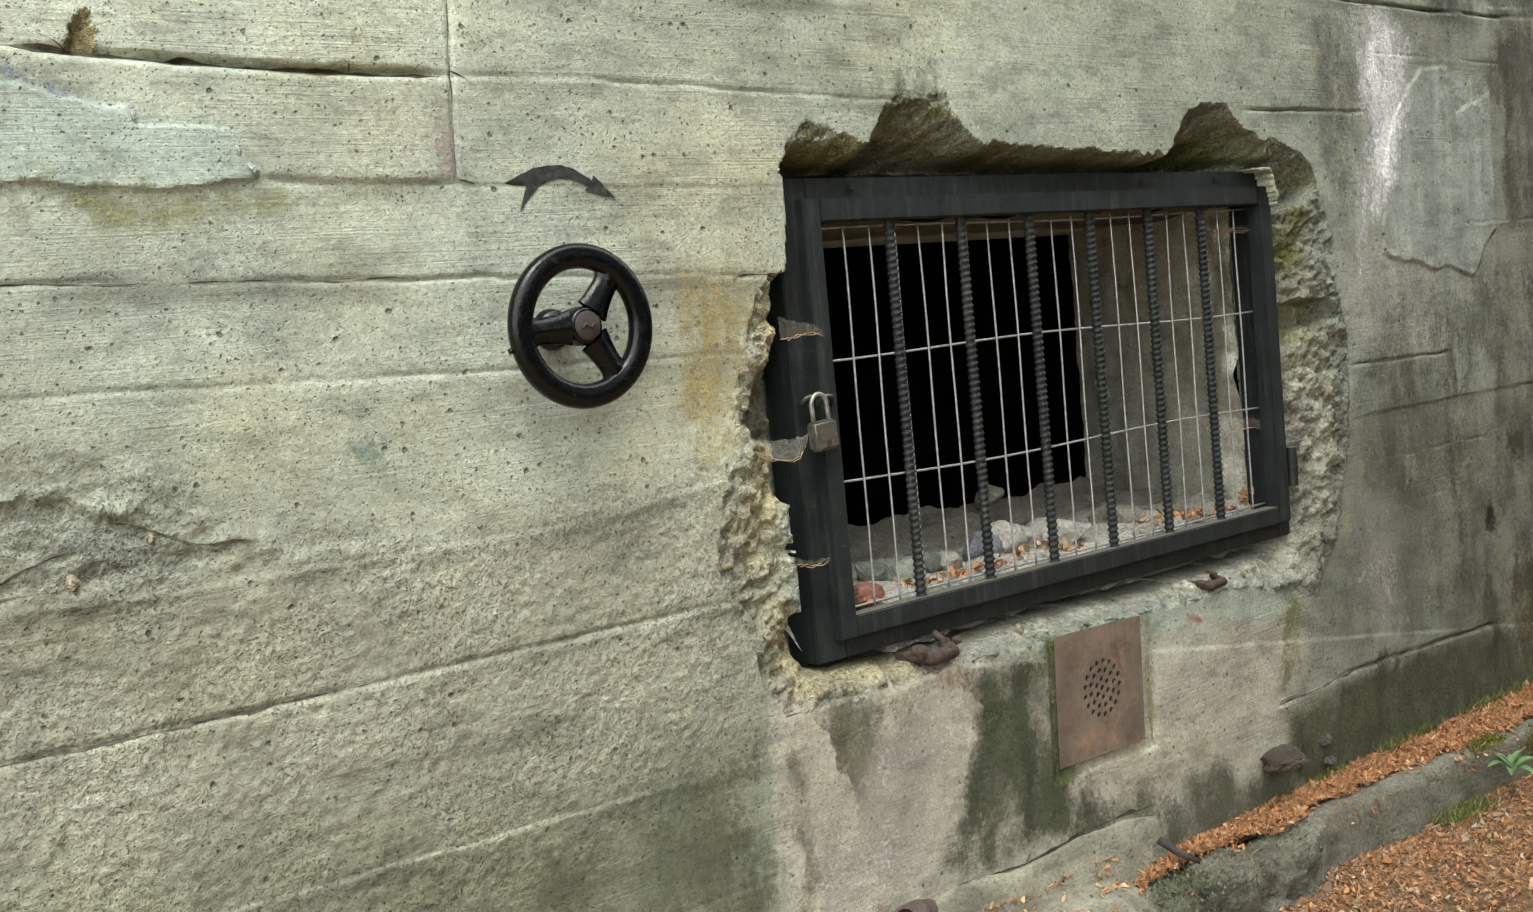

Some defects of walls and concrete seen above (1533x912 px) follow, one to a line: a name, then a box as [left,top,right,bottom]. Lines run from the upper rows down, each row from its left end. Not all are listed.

crack [0,4,475,184]
damp [1319,11,1410,233]
damp [1487,33,1533,220]
crack [0,552,76,602]
crack [107,516,249,546]
spalling [716,88,1350,715]
damp [1346,266,1533,644]
damp [959,704,1001,838]